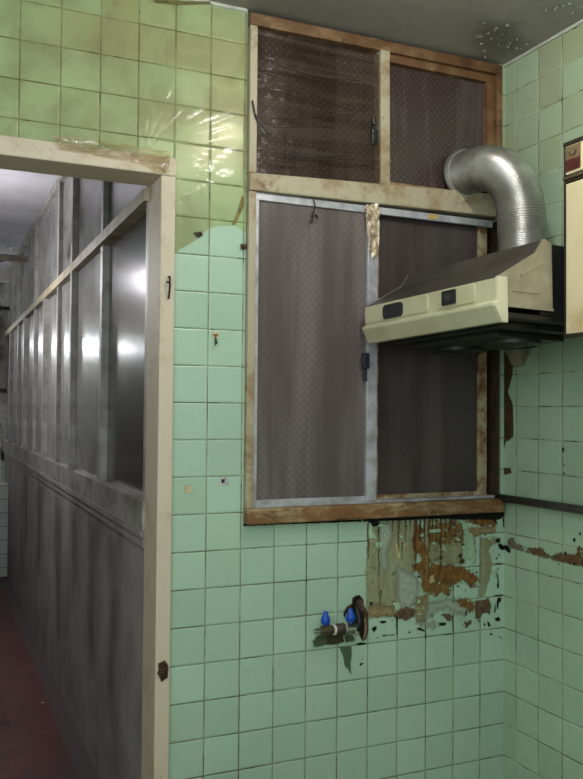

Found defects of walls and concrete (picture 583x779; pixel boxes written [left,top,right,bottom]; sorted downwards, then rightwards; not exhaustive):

peeling [343,519,497,642]
corrosion [412,519,497,596]
corrosion [457,598,474,611]
peeling [507,538,583,567]